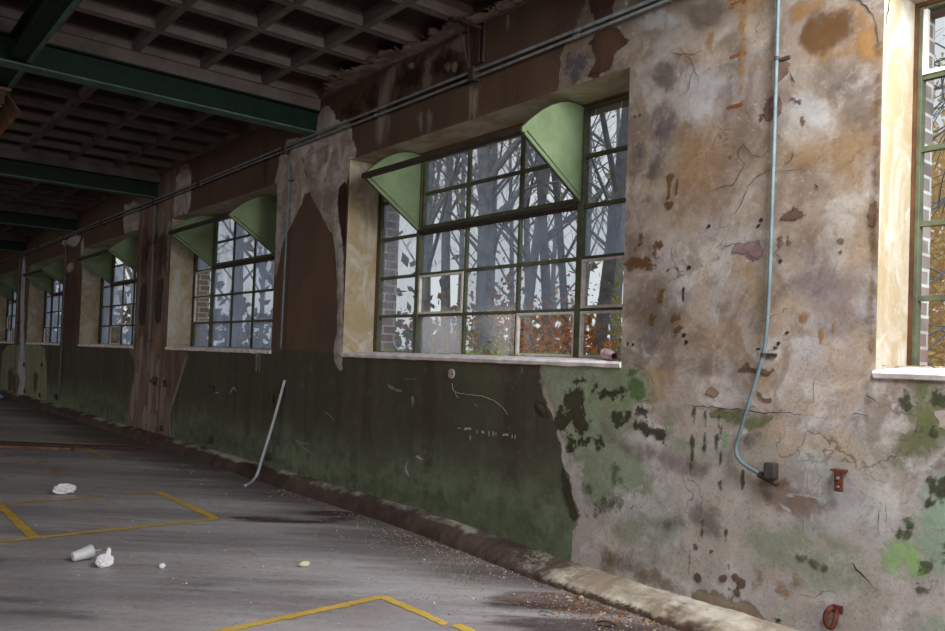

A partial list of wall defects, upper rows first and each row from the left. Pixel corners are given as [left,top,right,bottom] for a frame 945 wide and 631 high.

flaking render [139,278,164,326]
peeling [274,0,531,371]
flaking render [534,0,945,631]
crack [859,0,890,43]